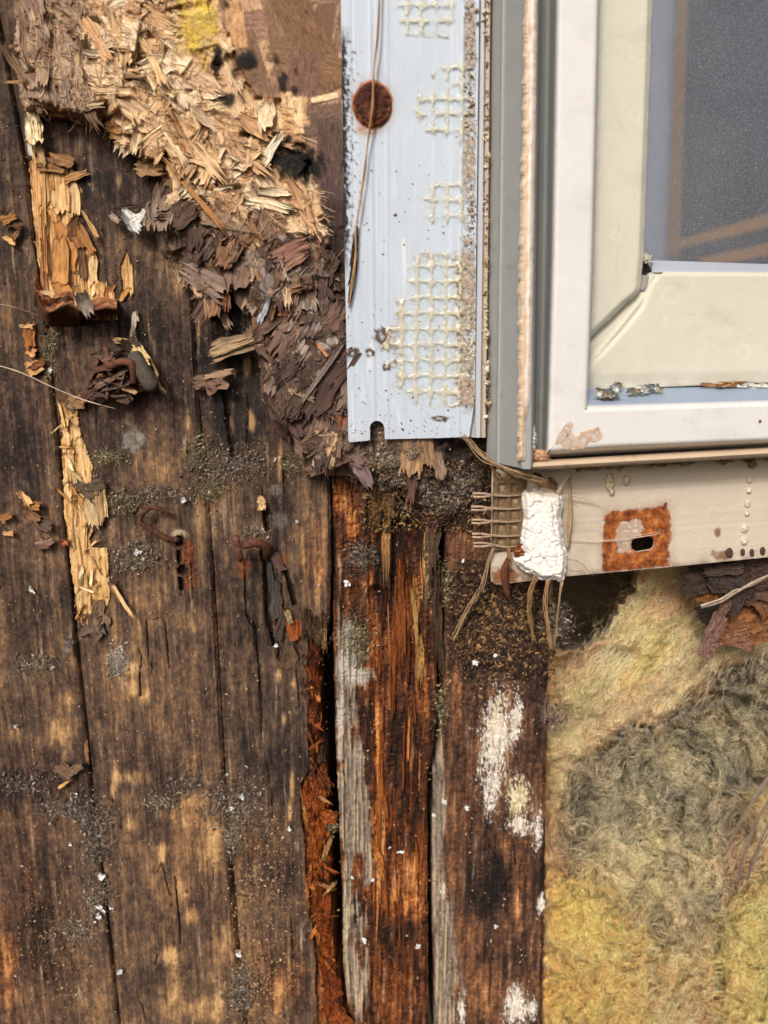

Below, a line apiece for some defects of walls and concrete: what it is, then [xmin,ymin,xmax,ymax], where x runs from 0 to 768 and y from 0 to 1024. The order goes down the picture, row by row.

rust [352,80,393,133]
spalling [0,0,493,1024]
rust [602,503,671,571]
water stain [337,690,345,756]
water stain [475,676,543,852]
water stain [500,983,538,1024]